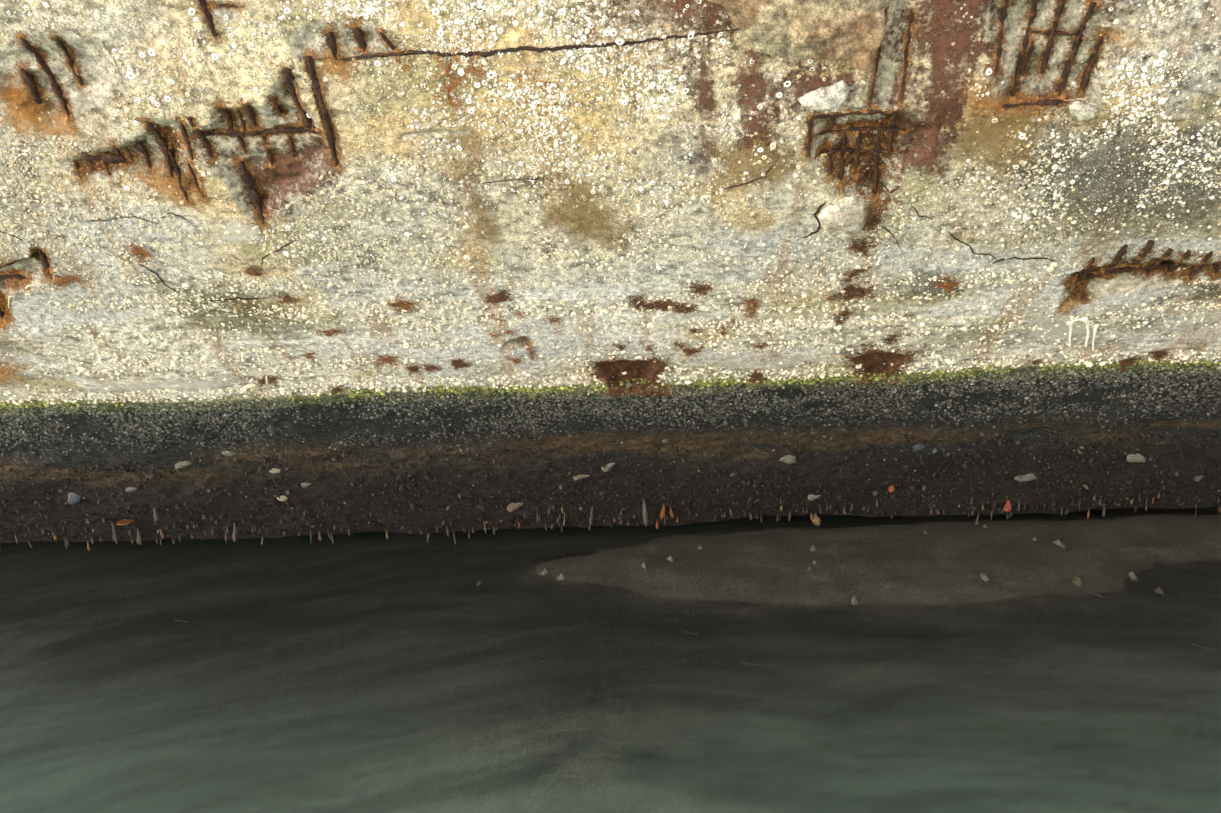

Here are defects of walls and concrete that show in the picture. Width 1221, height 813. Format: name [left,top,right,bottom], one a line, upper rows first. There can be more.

spalling [0,29,123,133]
spalling [193,0,247,47]
spalling [61,15,402,235]
crack [314,29,741,62]
spalling [799,0,941,212]
spalling [978,0,1147,118]
rust [383,296,420,313]
rust [371,355,473,376]
rust [481,285,537,365]
rust [584,281,732,398]
rust [842,312,925,387]
spalling [1058,240,1221,311]